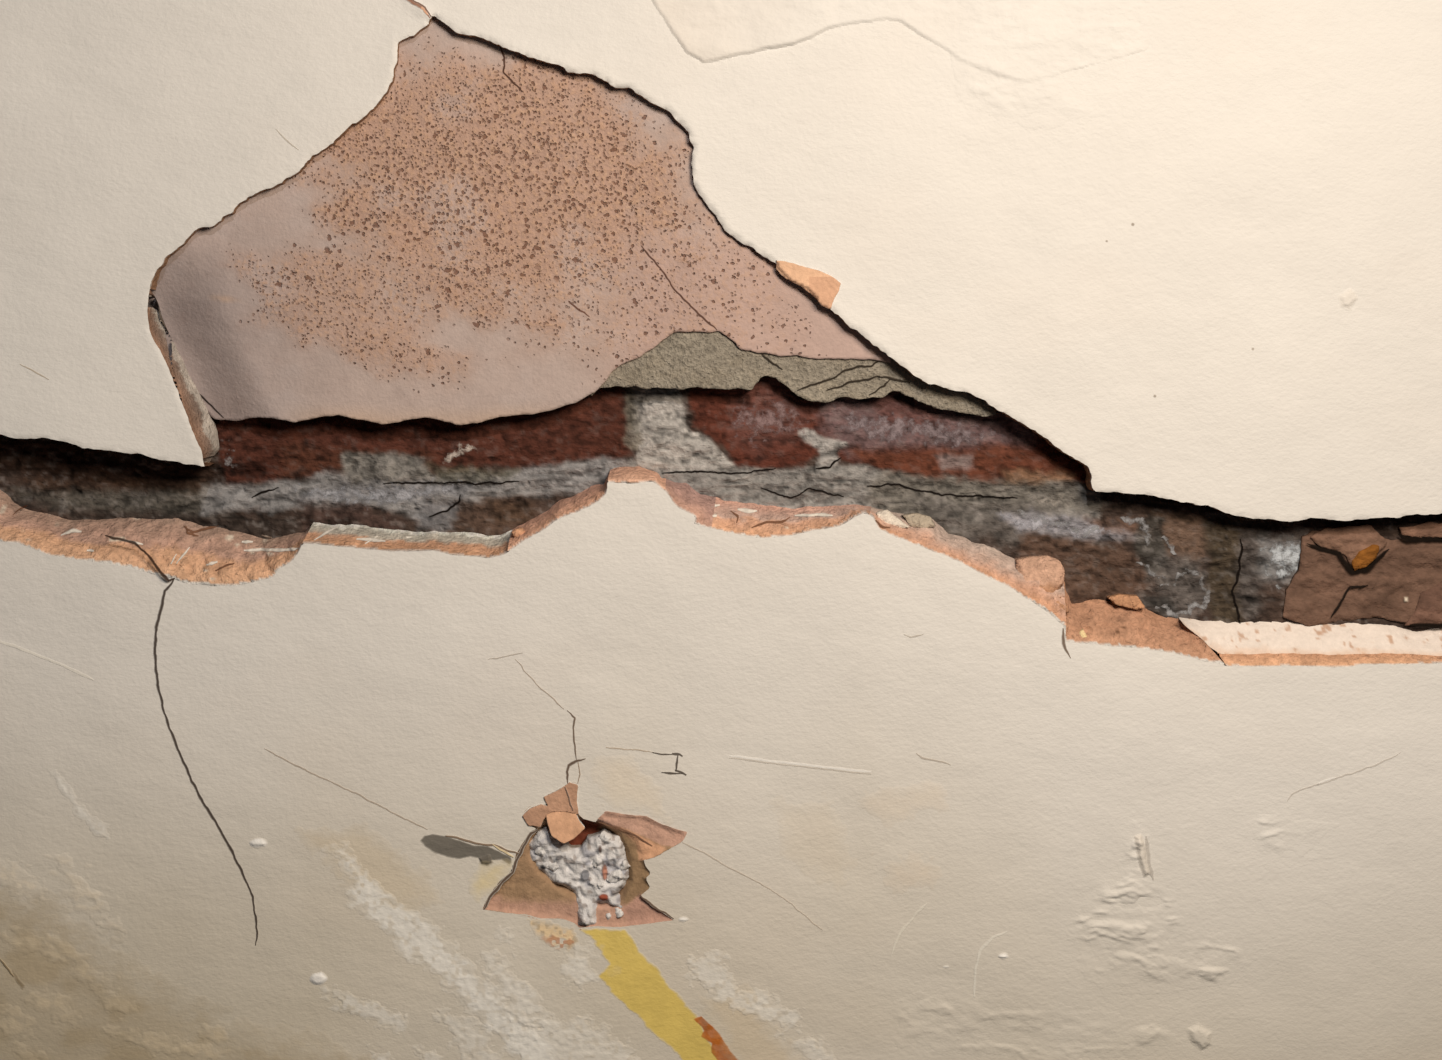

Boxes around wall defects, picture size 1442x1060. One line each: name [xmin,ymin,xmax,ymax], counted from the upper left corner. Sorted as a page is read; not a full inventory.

flaking render [147,16,1094,491]
flaking render [483,782,687,930]
rust [693,1016,728,1060]
crack [0,376,1442,945]